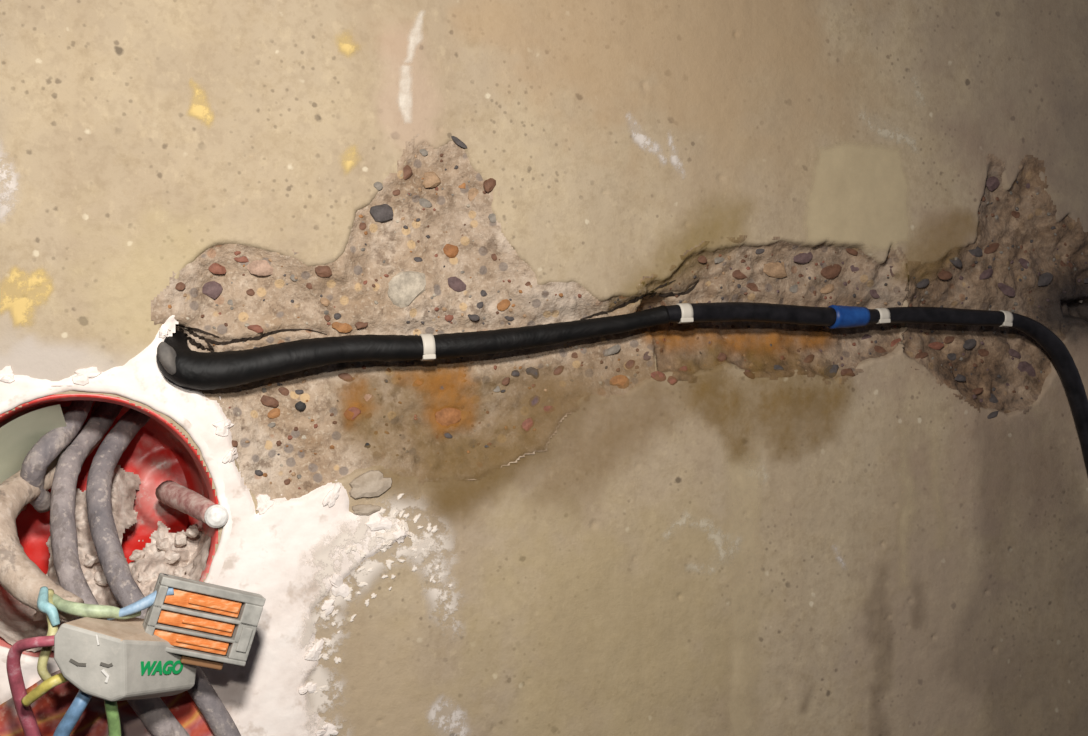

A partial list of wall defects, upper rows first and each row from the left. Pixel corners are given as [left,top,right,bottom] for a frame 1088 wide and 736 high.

spalling [151,134,1088,352]
crack [580,280,699,320]
crack [175,324,324,352]
corrosion [707,332,825,352]
spalling [199,321,1051,515]